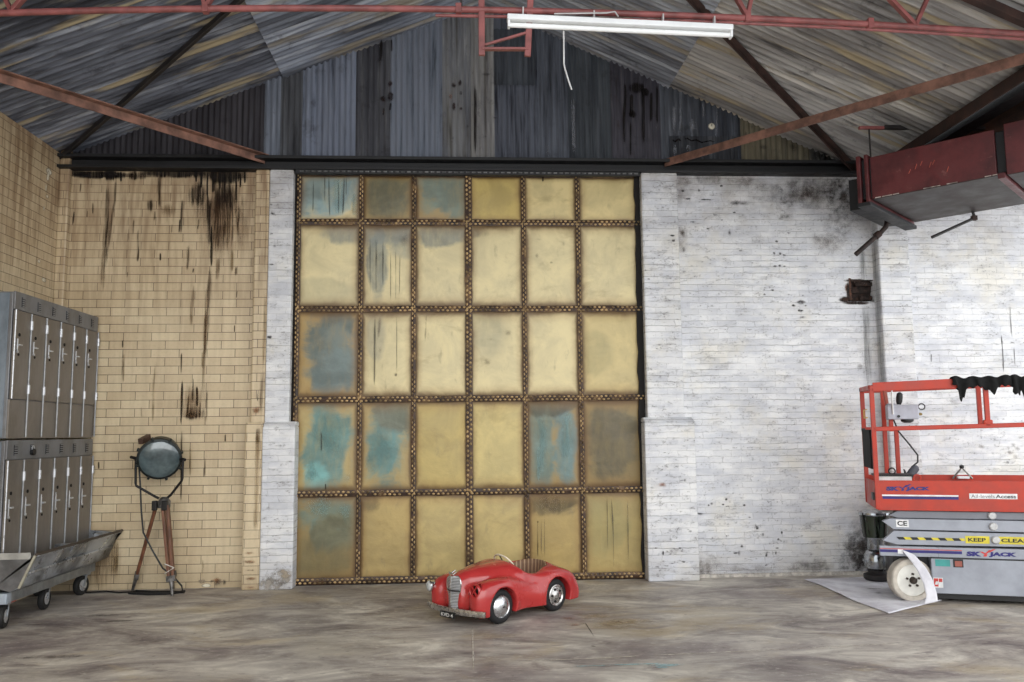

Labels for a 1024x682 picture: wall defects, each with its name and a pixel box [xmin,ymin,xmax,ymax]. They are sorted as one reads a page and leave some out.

damp [105,186,116,244]
damp [148,180,238,356]
damp [180,383,207,421]
damp [853,538,867,564]